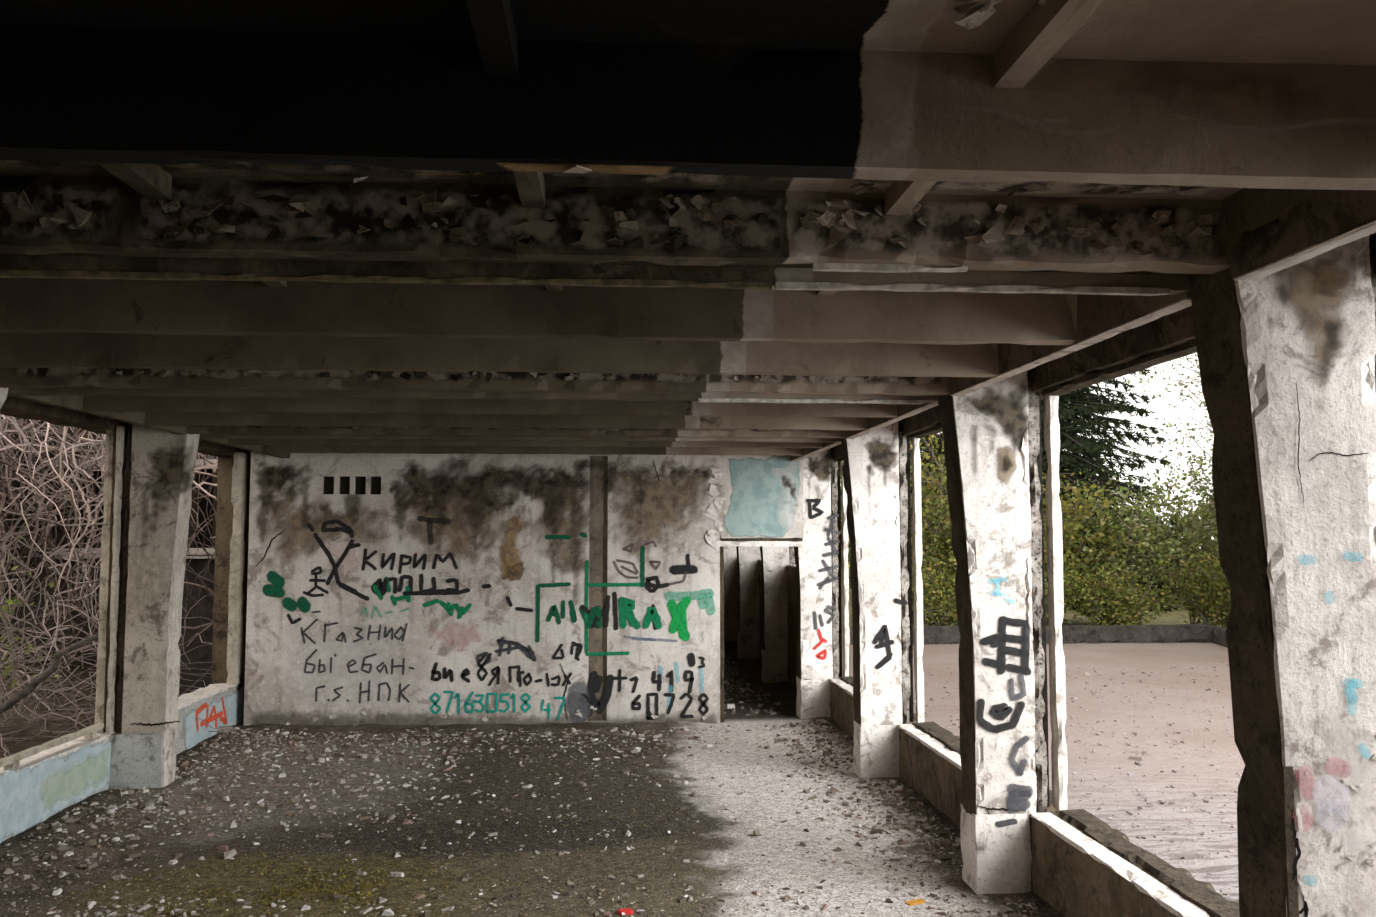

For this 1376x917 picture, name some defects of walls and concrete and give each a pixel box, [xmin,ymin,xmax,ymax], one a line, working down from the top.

damp [1278,255,1363,378]
damp [972,381,1034,471]
damp [258,463,378,559]
damp [390,460,708,572]
crack [1291,808,1309,917]